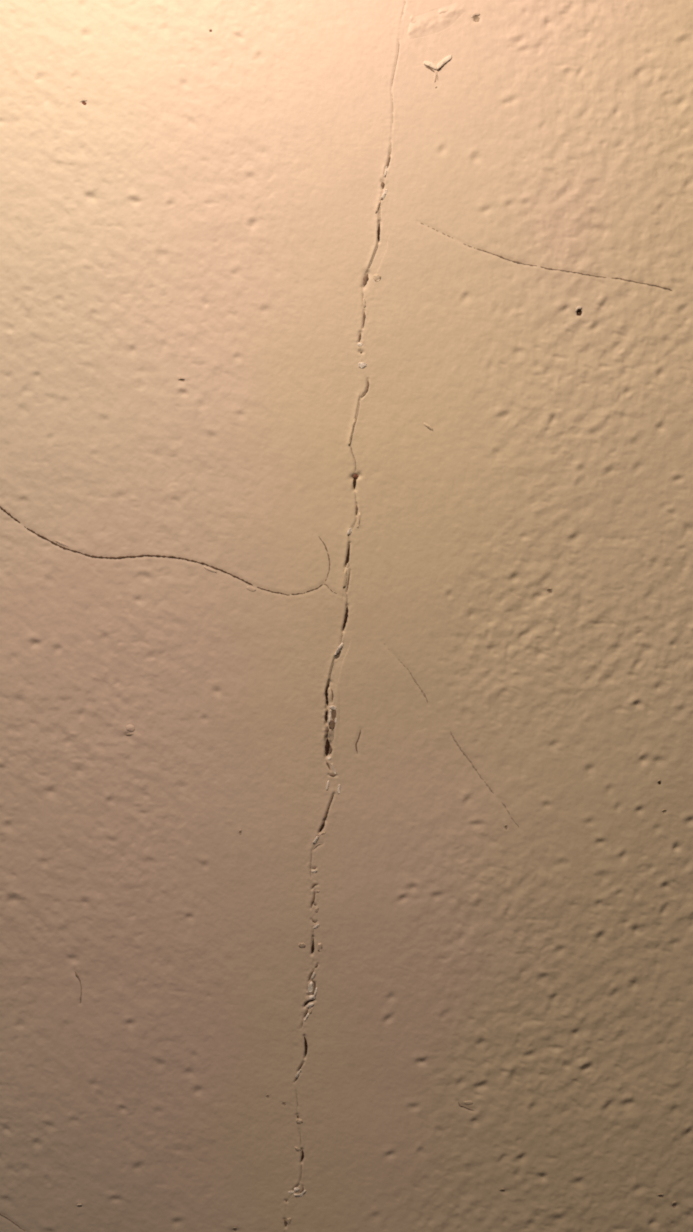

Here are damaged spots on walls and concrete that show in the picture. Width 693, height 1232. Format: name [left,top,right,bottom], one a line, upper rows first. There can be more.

crack [0,0,416,1232]
crack [421,223,672,291]